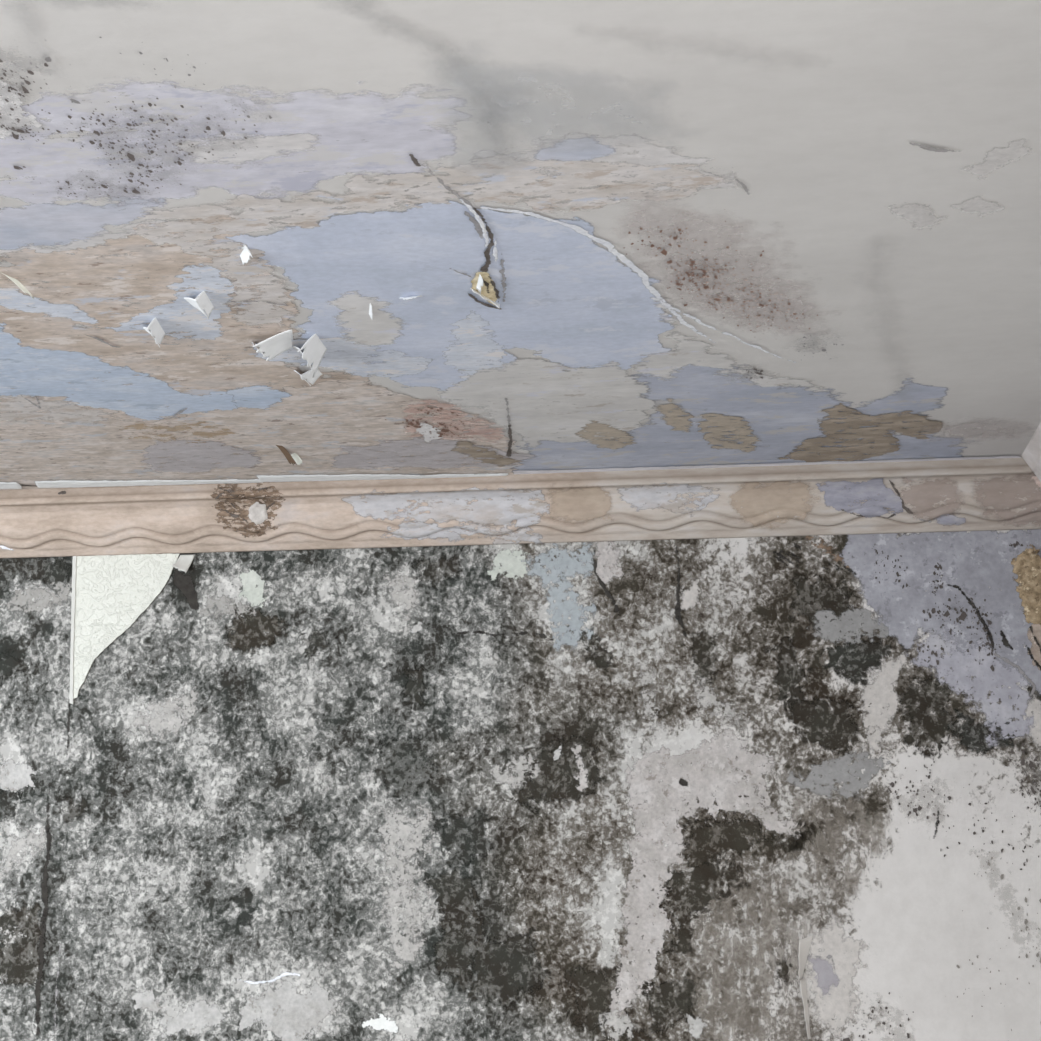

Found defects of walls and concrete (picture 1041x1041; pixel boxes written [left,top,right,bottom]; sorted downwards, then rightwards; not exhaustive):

water stain [0,42,276,203]
crack [409,154,506,310]
peeling [0,79,1022,651]
water stain [623,226,844,359]
peeling [787,476,1041,801]
crack [948,584,1036,704]
crack [64,702,72,755]
crack [34,782,61,1036]